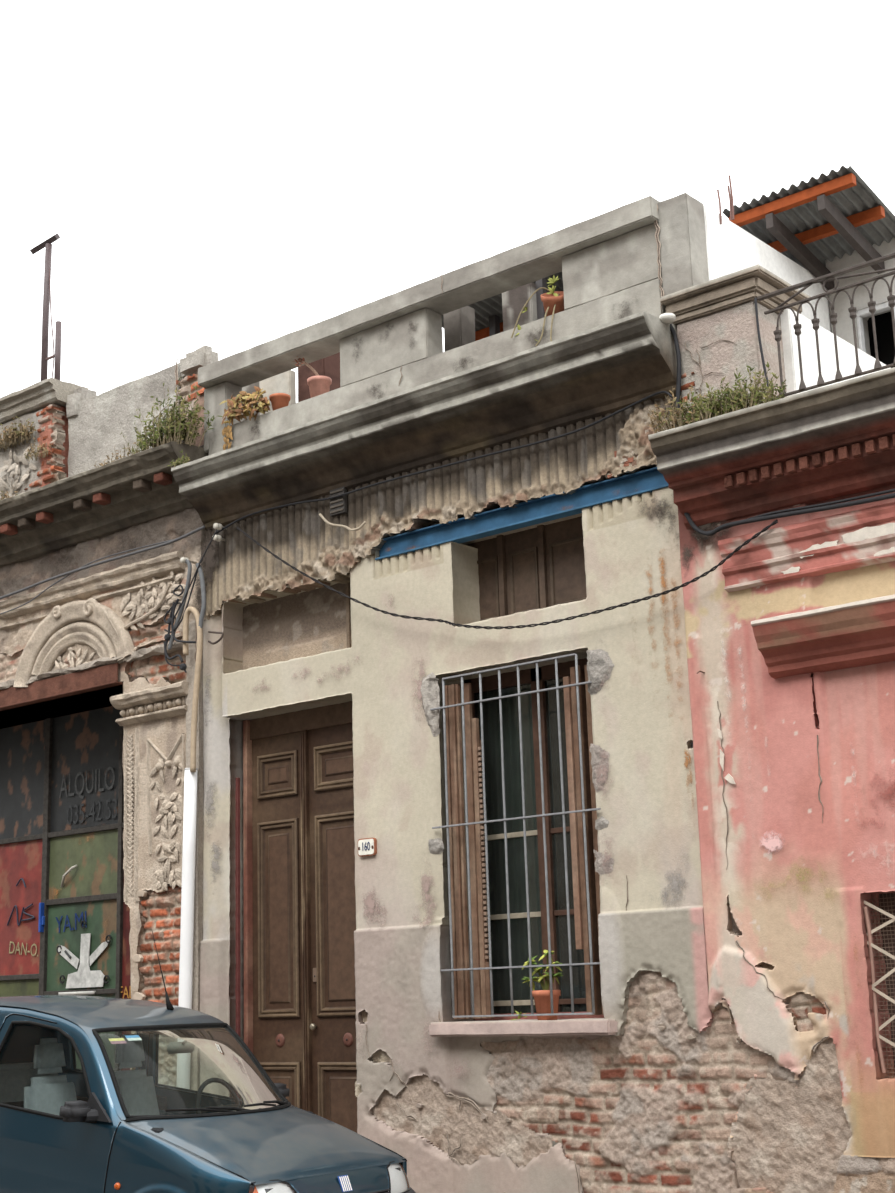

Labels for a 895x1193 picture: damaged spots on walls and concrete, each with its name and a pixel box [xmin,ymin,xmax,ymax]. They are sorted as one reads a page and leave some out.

spalling [24,404,67,490]
spalling [601,422,657,479]
peeling [782,523,895,577]
spalling [0,614,189,690]
crack [717,701,729,870]
crack [816,735,824,823]
spalling [132,879,182,1006]
crack [731,912,784,1000]
crack [366,1024,417,1120]
spalling [371,970,852,1193]